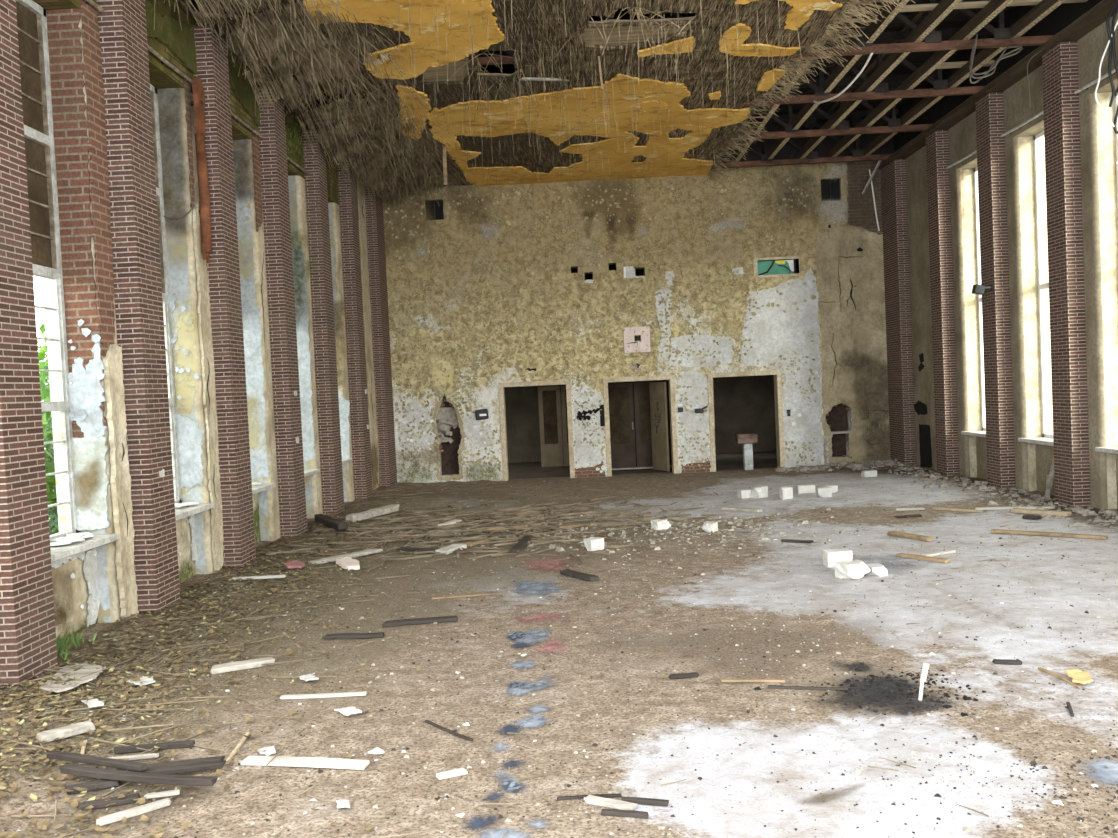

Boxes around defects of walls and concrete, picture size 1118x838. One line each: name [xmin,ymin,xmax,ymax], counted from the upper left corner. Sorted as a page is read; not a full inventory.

leakage [157,87,186,231]
leakage [232,139,251,197]
peeling [227,47,263,232]
spalling [455,132,611,173]
spalling [627,131,649,162]
spalling [667,128,692,138]
crack [819,256,858,310]
flaking render [46,0,115,627]
peeling [385,160,891,482]